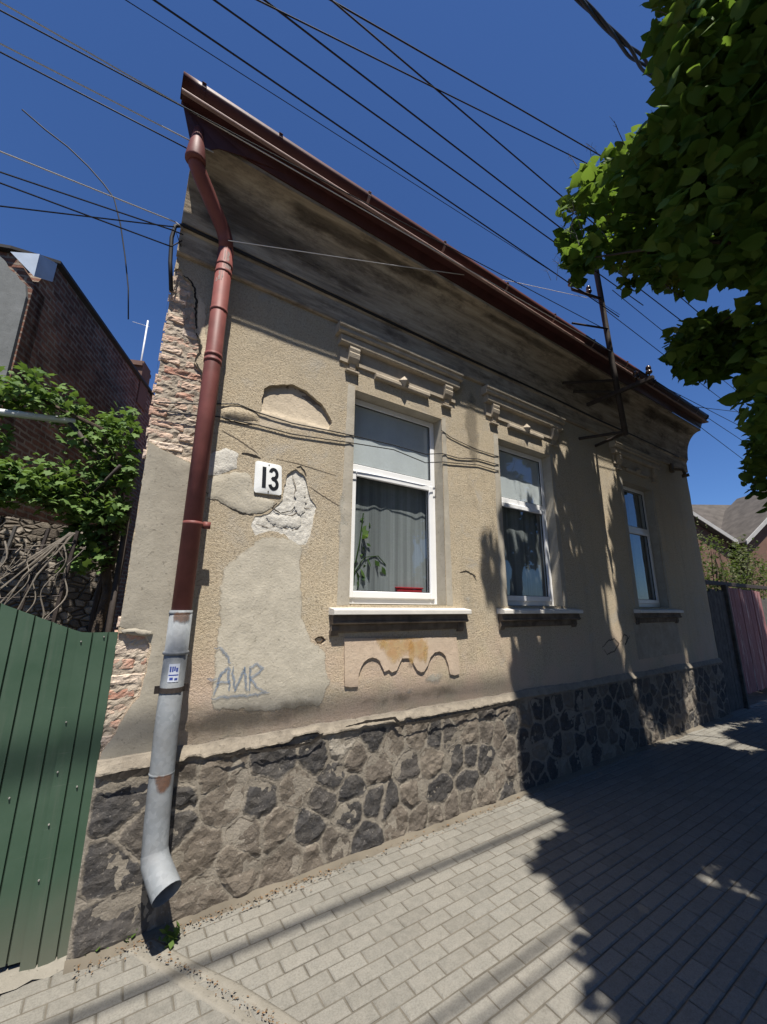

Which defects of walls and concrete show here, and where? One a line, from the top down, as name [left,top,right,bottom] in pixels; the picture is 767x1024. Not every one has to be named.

leakage [296,204,427,280]
flaking render [142,268,207,462]
flaking render [251,469,316,545]
flaking render [98,616,153,760]